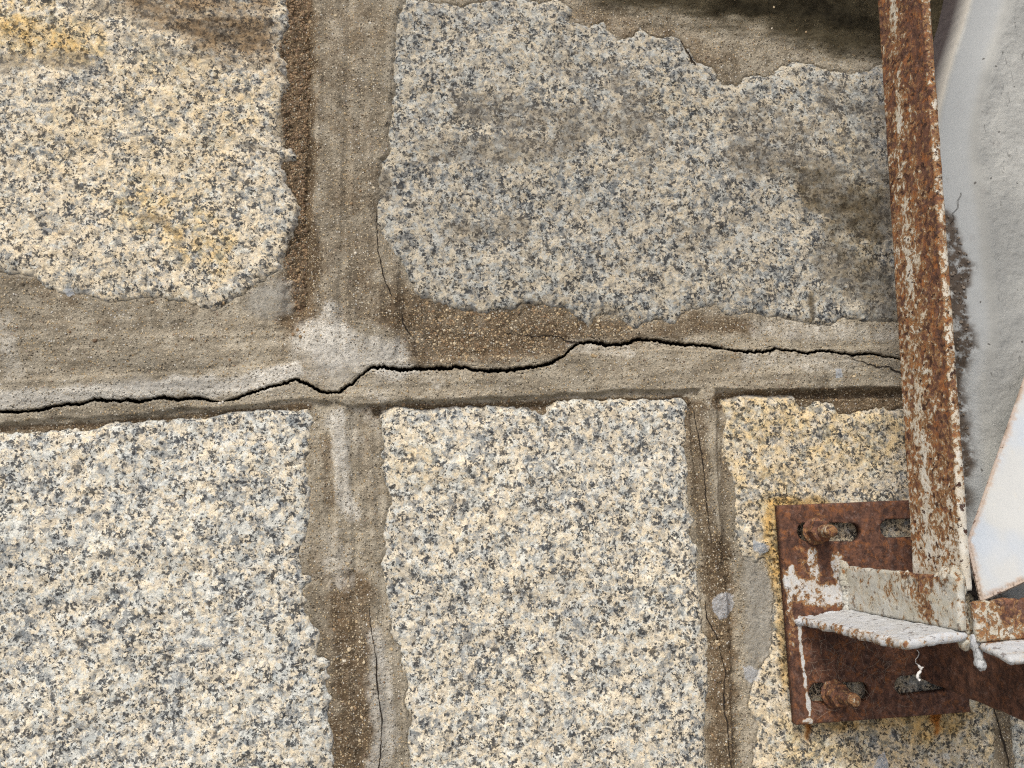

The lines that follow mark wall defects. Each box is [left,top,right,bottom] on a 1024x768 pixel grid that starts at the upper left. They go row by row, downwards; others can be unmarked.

leakage [618,0,881,53]
leakage [930,0,943,41]
crack [0,332,901,418]